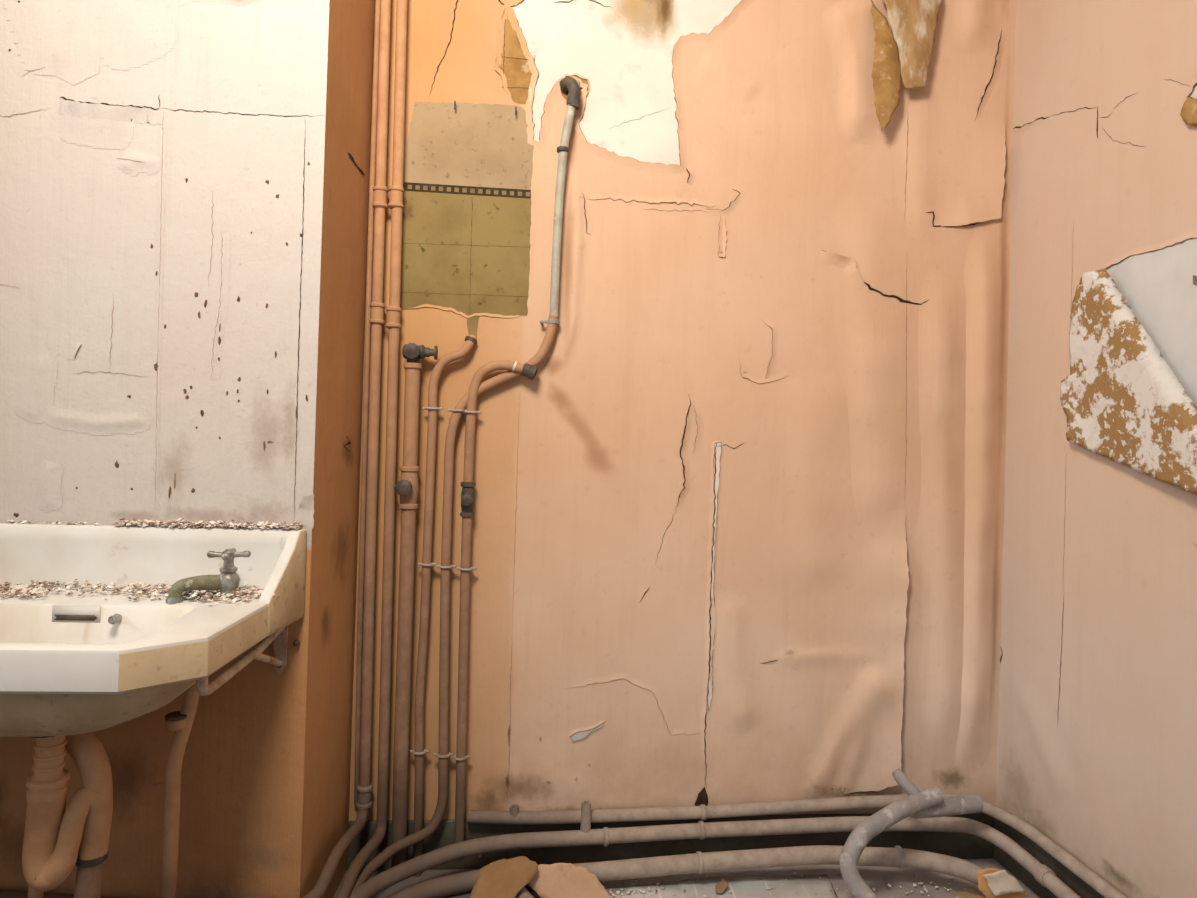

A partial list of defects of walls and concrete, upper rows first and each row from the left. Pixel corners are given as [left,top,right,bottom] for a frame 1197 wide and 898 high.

crack [176,0,259,8]
crack [429,0,458,95]
crack [553,0,612,8]
water stain [619,0,671,31]
crack [975,30,1008,121]
crack [1013,94,1144,147]
crack [0,96,324,512]
crack [817,250,928,481]
crack [566,392,744,789]